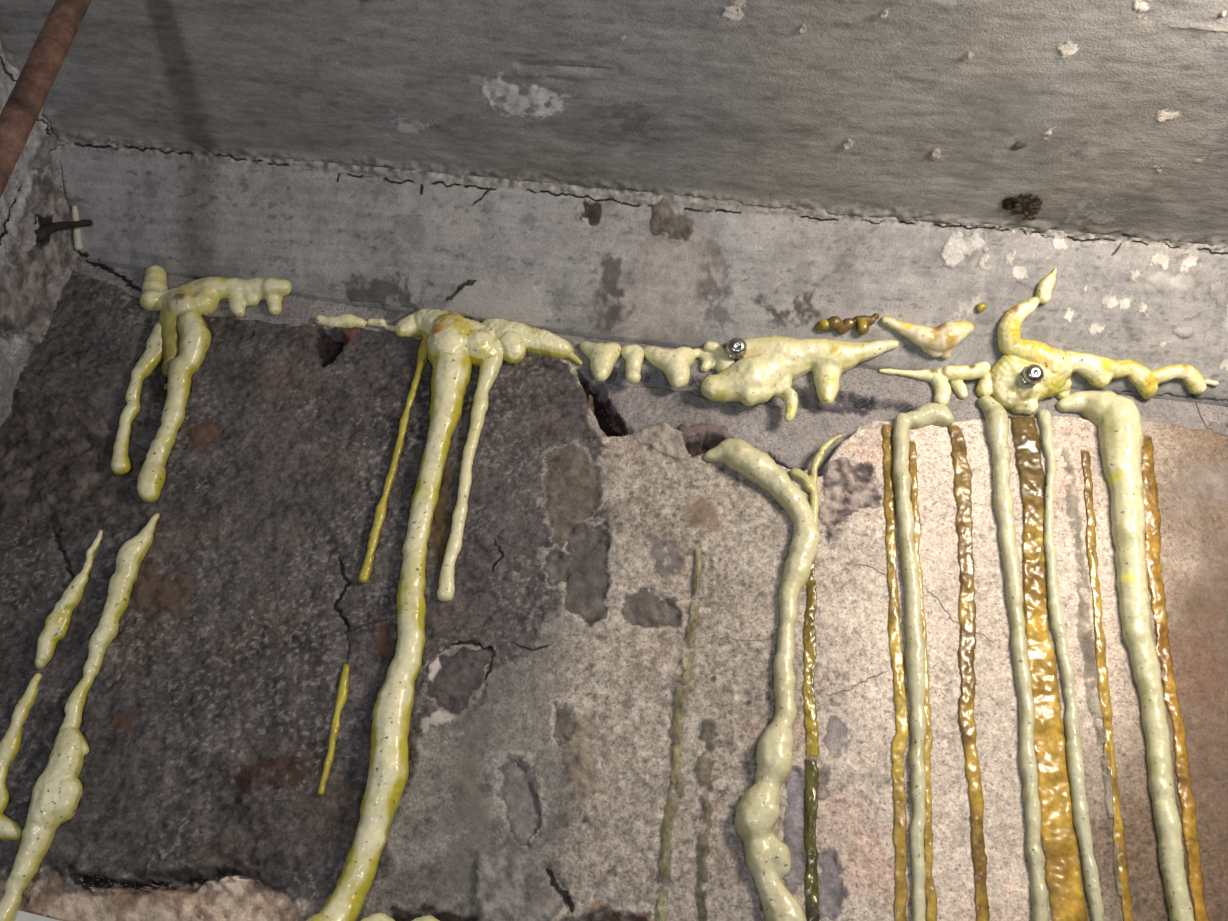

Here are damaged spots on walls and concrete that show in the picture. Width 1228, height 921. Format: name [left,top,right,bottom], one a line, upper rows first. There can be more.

crack [0,57,17,81]
efflorescence [469,72,570,119]
crack [36,119,289,166]
crack [0,184,22,245]
crack [337,174,496,206]
crack [527,189,653,207]
crack [684,206,740,214]
crack [801,215,1228,256]